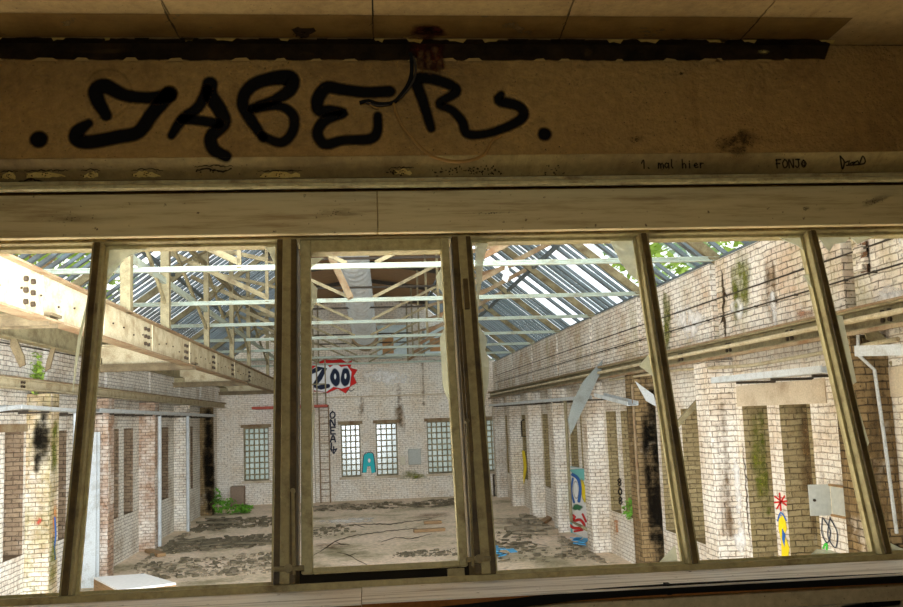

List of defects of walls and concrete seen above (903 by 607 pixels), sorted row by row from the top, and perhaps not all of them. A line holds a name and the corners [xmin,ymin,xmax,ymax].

rust [409,25,444,40]
peeling [0,169,68,182]
water stain [645,390,664,559]